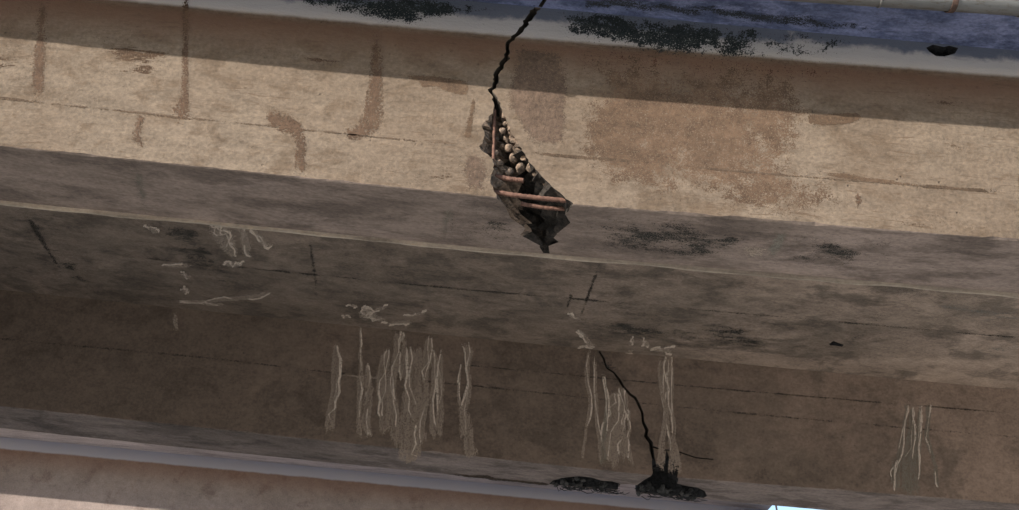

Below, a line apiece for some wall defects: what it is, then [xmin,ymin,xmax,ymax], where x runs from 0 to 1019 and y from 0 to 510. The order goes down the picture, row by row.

crack [488,0,546,117]
leakage [563,0,867,58]
peeling [461,48,847,253]
leakage [162,263,269,331]
leakage [206,225,273,268]
leakage [324,304,445,464]
leakage [457,342,478,459]
leakage [567,312,635,469]
spalling [549,451,707,502]
leakage [627,336,682,474]
crack [310,350,1015,463]
leakage [890,402,940,495]